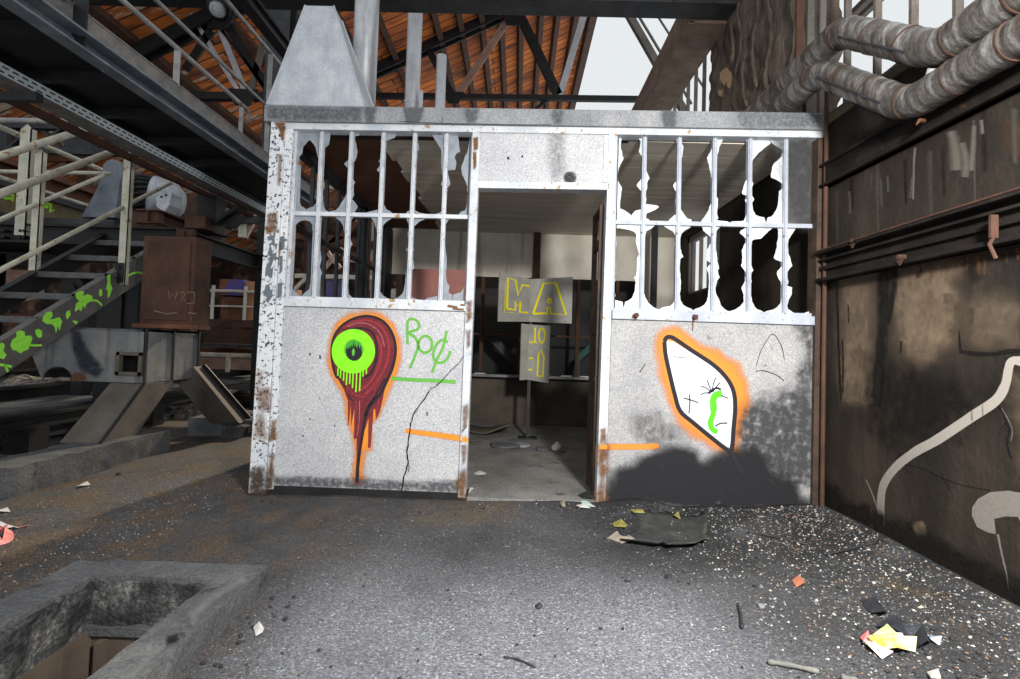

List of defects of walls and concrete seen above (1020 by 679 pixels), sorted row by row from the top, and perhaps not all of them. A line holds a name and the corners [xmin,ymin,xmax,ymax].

rust [267,213,281,264]
rust [813,186,1020,253]
crack [401,357,463,491]
rust [596,429,609,502]